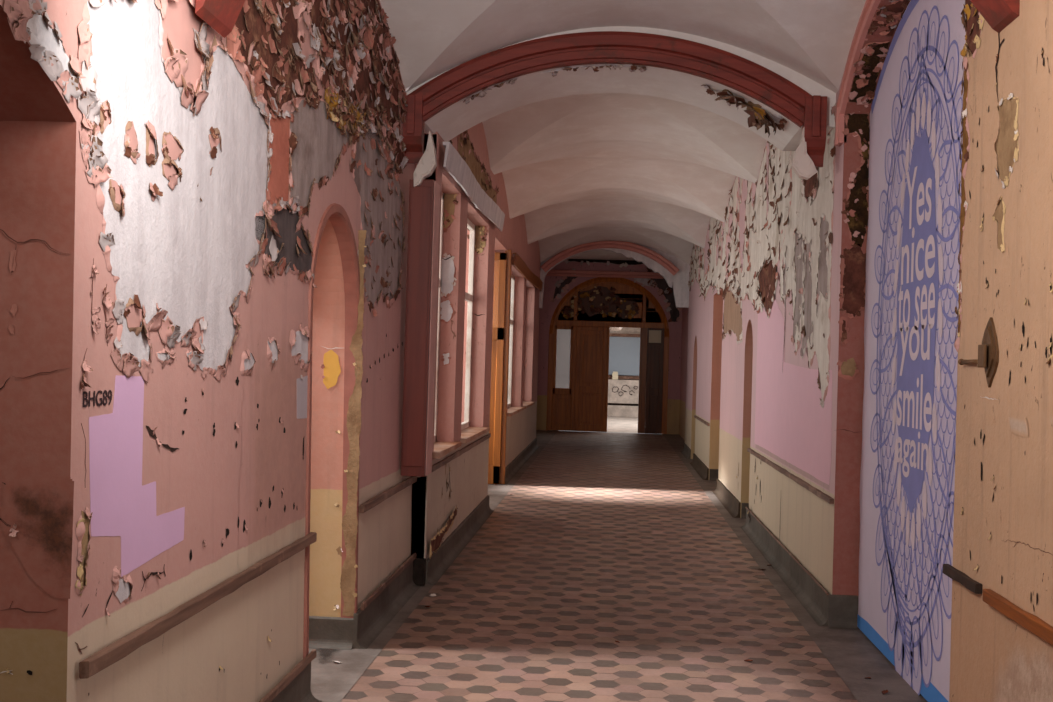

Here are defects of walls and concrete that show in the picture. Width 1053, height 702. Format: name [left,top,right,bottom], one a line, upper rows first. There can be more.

peeling [538,64,647,77]
peeling [3,0,408,395]
peeling [688,0,909,408]
crack [0,229,66,267]
crack [0,258,115,389]
peeling [549,259,683,322]
flaking render [990,629,1053,702]